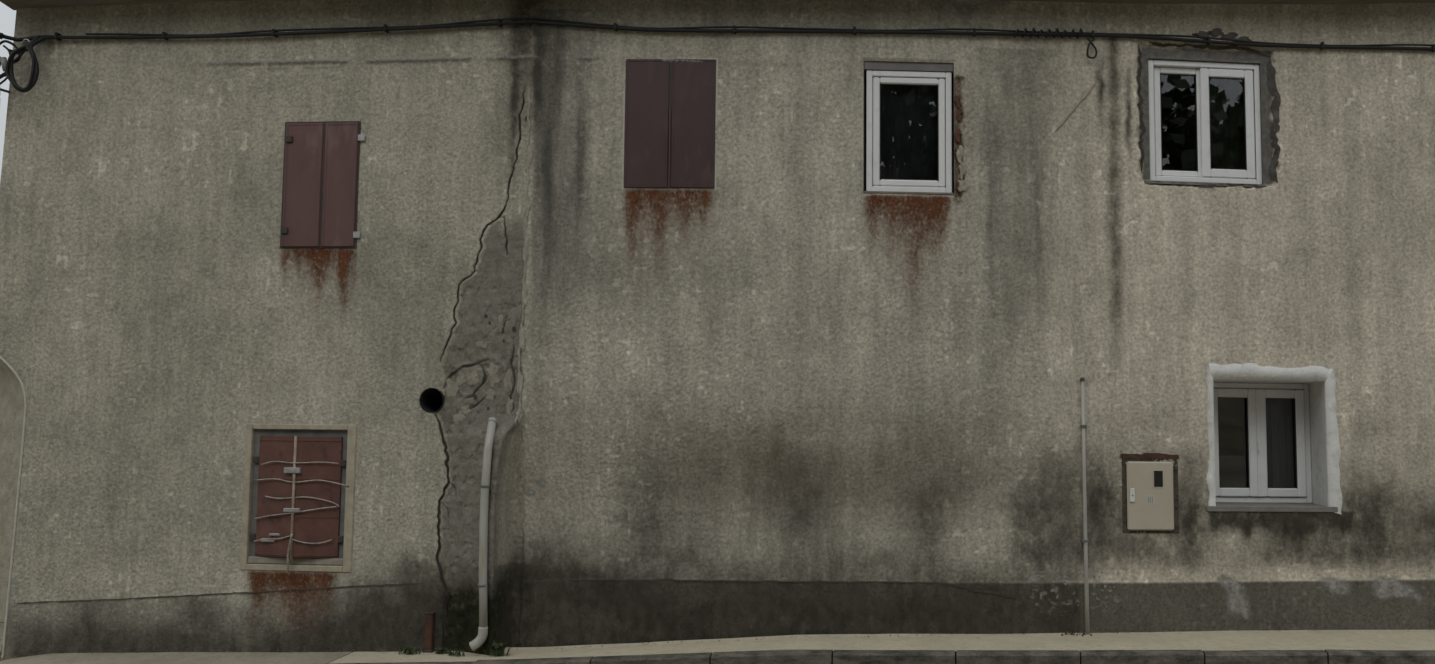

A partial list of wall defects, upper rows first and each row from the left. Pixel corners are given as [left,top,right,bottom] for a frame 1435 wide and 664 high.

crack [440,90,525,361]
rust [626,190,710,237]
rust [866,195,948,259]
rust [282,249,351,291]
flaking render [440,229,524,424]
water stain [1168,494,1419,562]
rust [251,572,333,614]
water stain [463,563,1079,647]